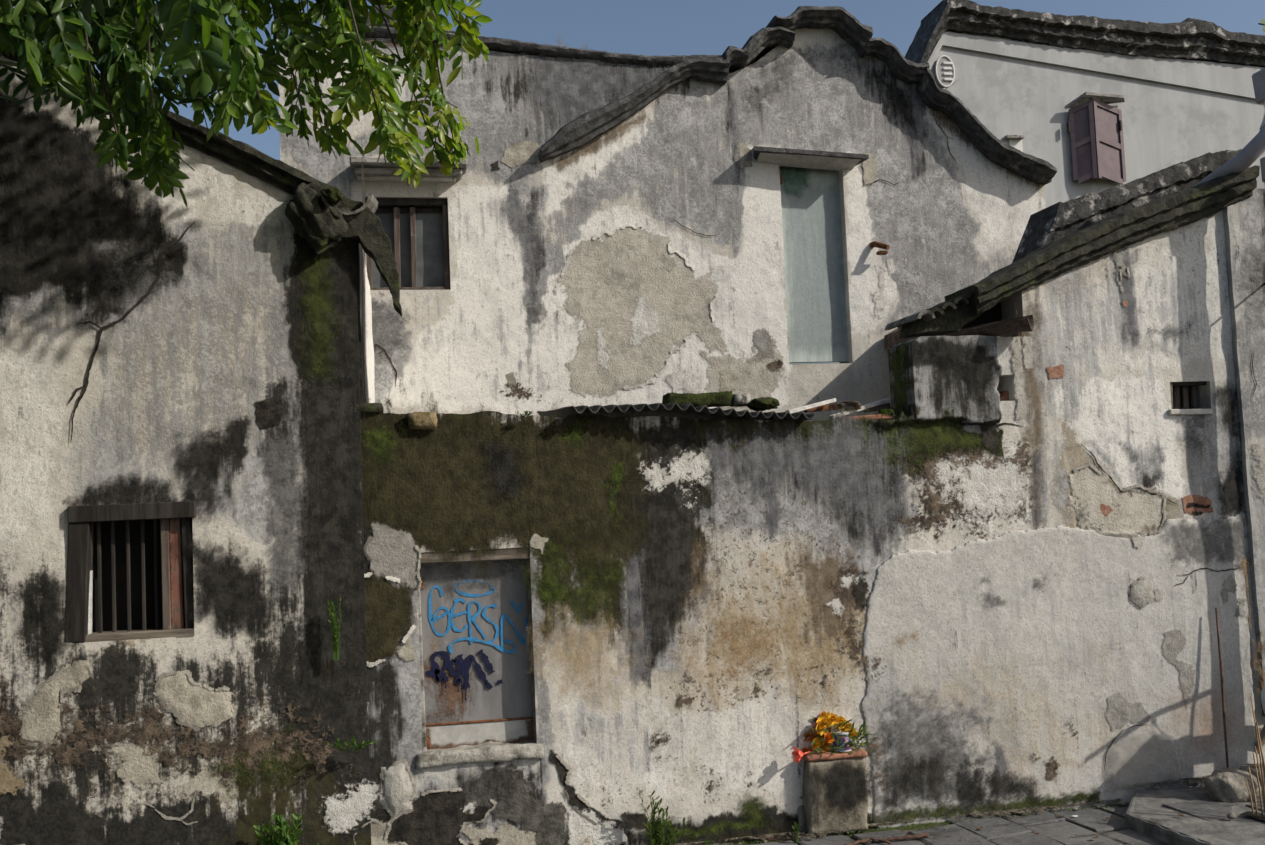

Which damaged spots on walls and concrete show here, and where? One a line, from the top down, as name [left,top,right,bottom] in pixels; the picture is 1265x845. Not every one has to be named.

damp [0,90,173,334]
crack [69,222,195,442]
damp [502,185,547,323]
flaking render [557,223,785,412]
peeling [367,625,418,667]
peeling [364,523,422,589]
damp [530,534,548,554]
damp [604,411,911,681]
flaking render [1066,462,1167,539]
damp [1164,386,1248,570]
crack [1176,567,1244,585]
flaking render [0,659,649,845]